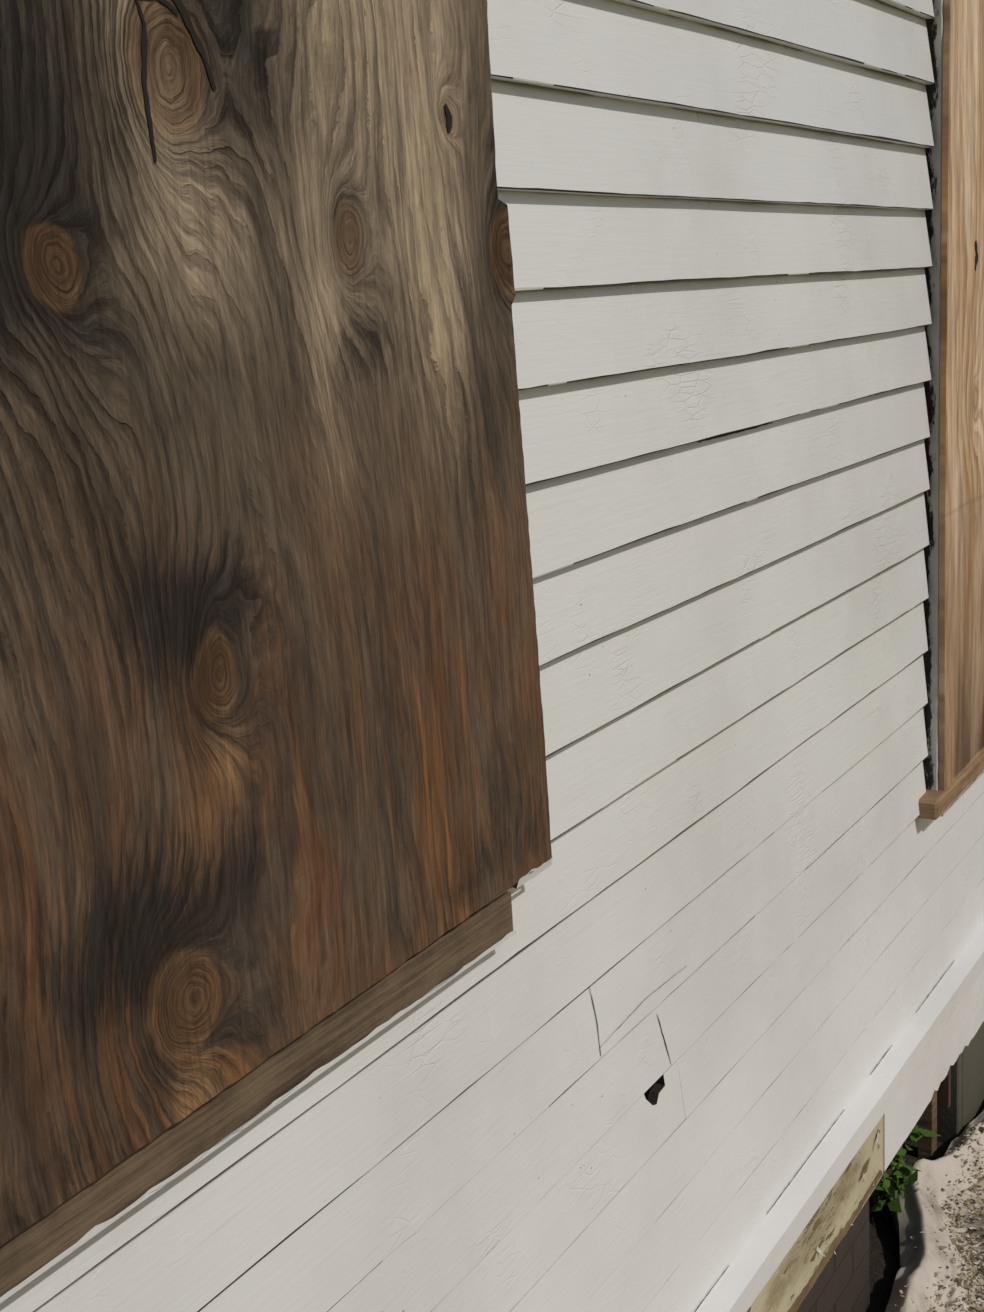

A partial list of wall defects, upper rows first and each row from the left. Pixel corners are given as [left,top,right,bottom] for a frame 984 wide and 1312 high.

crack [589,967,685,1062]
crack [767,1109,845,1214]
peeling [788,1129,883,1312]